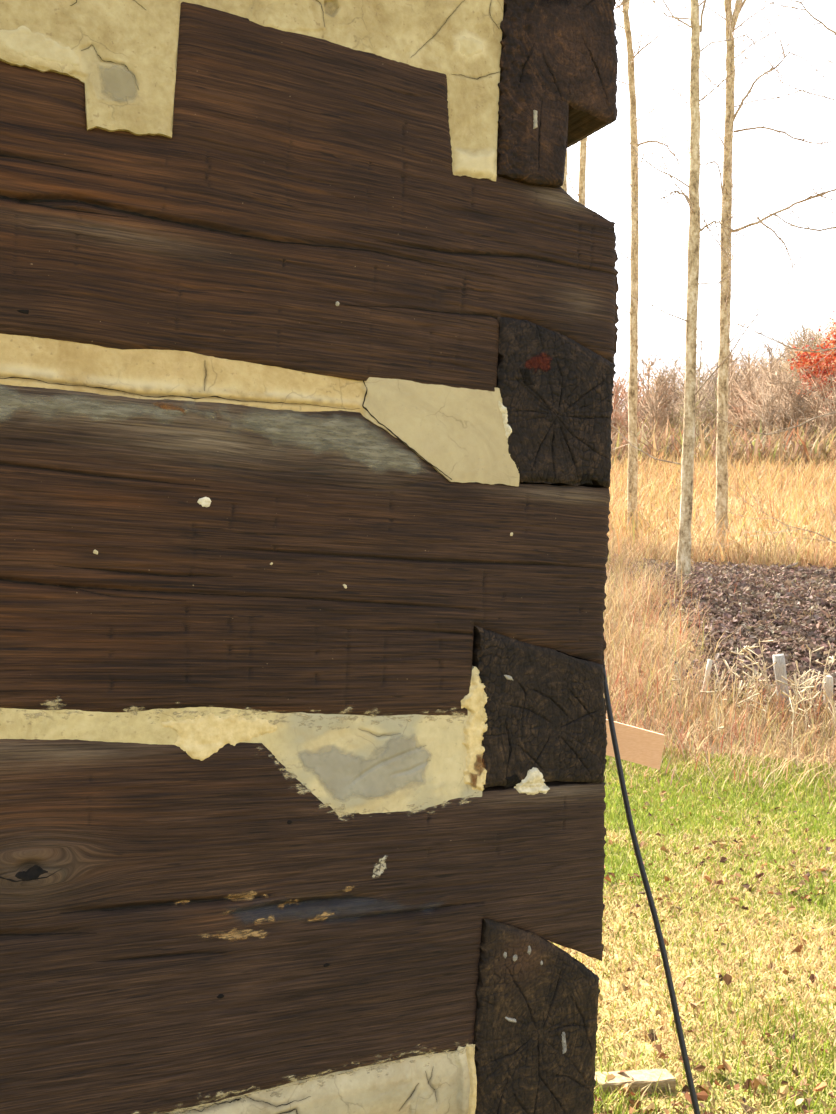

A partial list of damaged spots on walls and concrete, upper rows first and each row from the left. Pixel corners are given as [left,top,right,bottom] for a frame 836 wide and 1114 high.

water stain [0,386,186,420]
water stain [245,413,420,471]